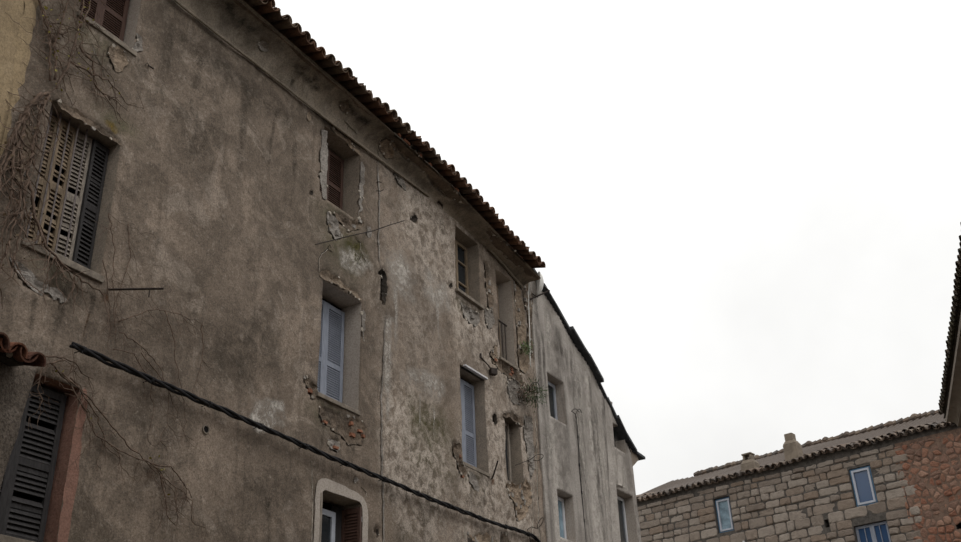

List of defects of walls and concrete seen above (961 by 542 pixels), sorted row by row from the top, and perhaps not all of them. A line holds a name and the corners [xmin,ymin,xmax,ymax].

spalling [318,126,372,239]
spalling [490,280,535,428]
spalling [452,443,467,479]
spalling [506,479,532,521]